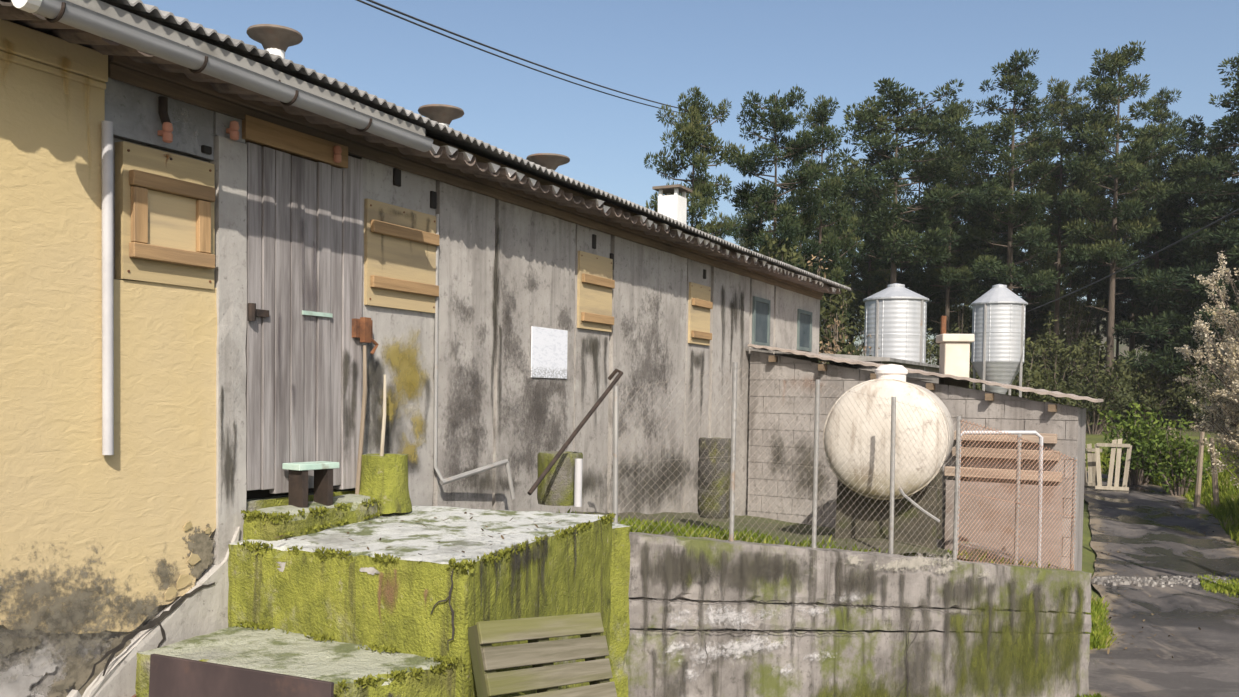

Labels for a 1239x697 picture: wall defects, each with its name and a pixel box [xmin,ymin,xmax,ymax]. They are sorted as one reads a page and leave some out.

water stain [450,227,566,492]
water stain [582,336,608,401]
water stain [690,350,704,408]
water stain [583,474,601,493]
water stain [619,457,698,511]
flaking render [0,632,131,697]
water stain [0,547,178,667]
crack [57,582,215,697]
water stain [642,542,820,697]